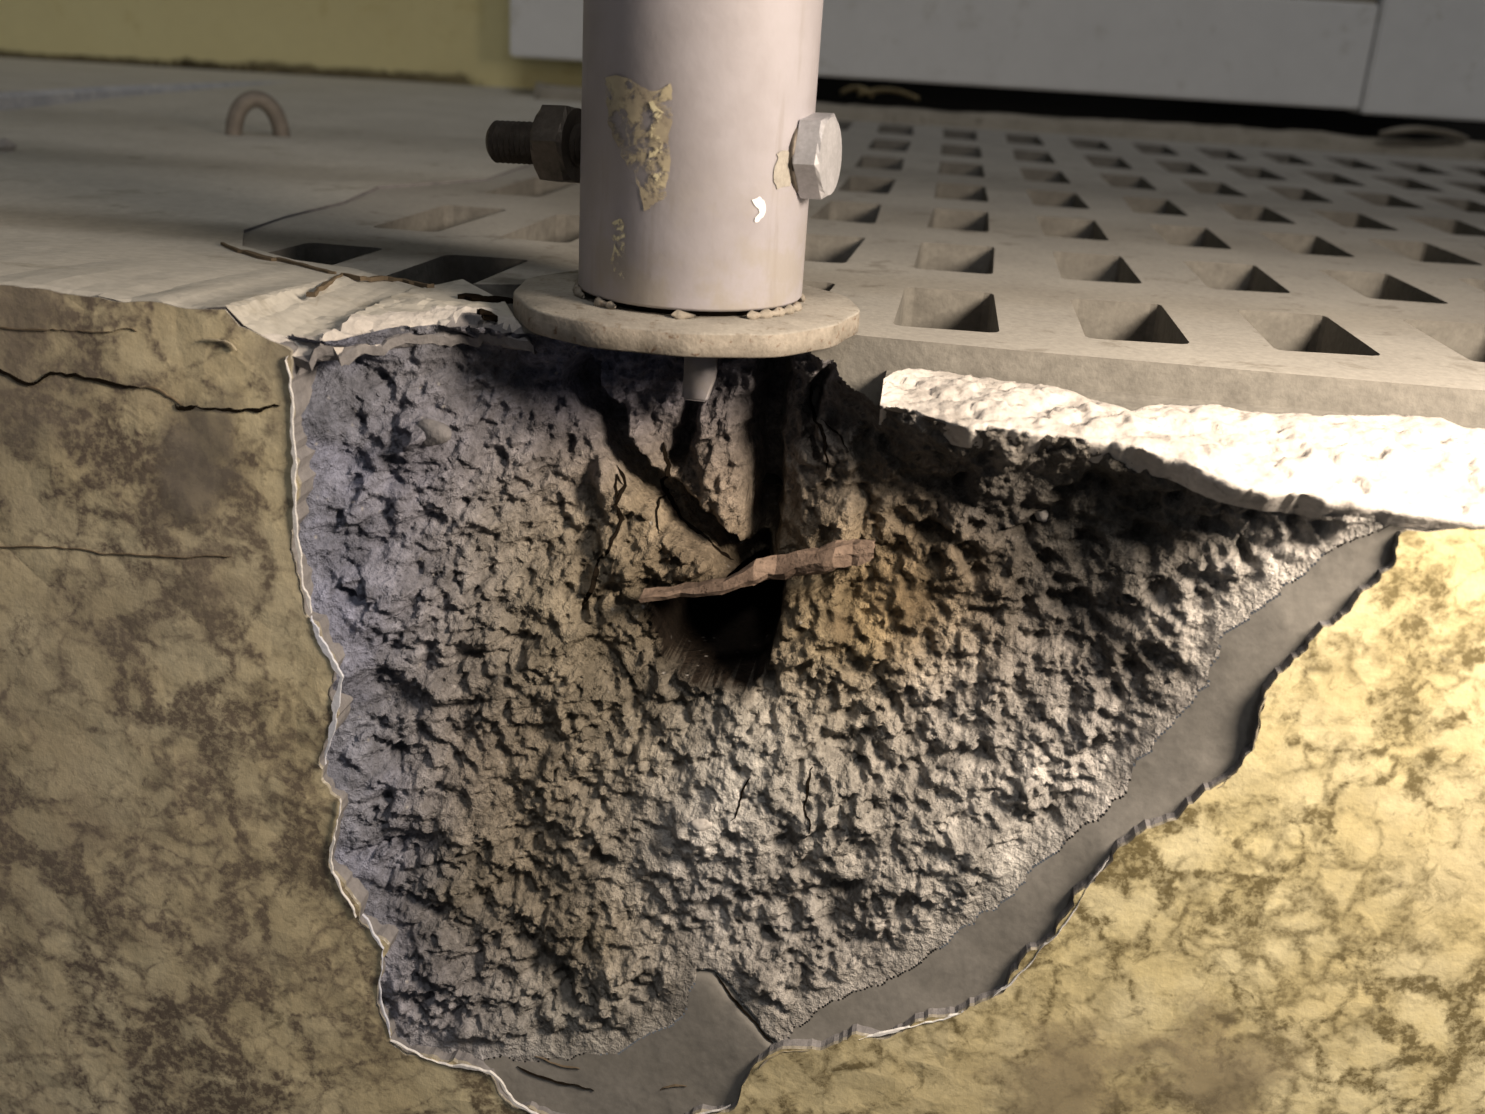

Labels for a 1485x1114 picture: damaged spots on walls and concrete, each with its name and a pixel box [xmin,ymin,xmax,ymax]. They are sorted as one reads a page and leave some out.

crack [0,326,136,334]
crack [0,369,280,413]
crack [582,442,734,611]
corrosion [638,539,876,603]
spalling [285,324,1417,1114]